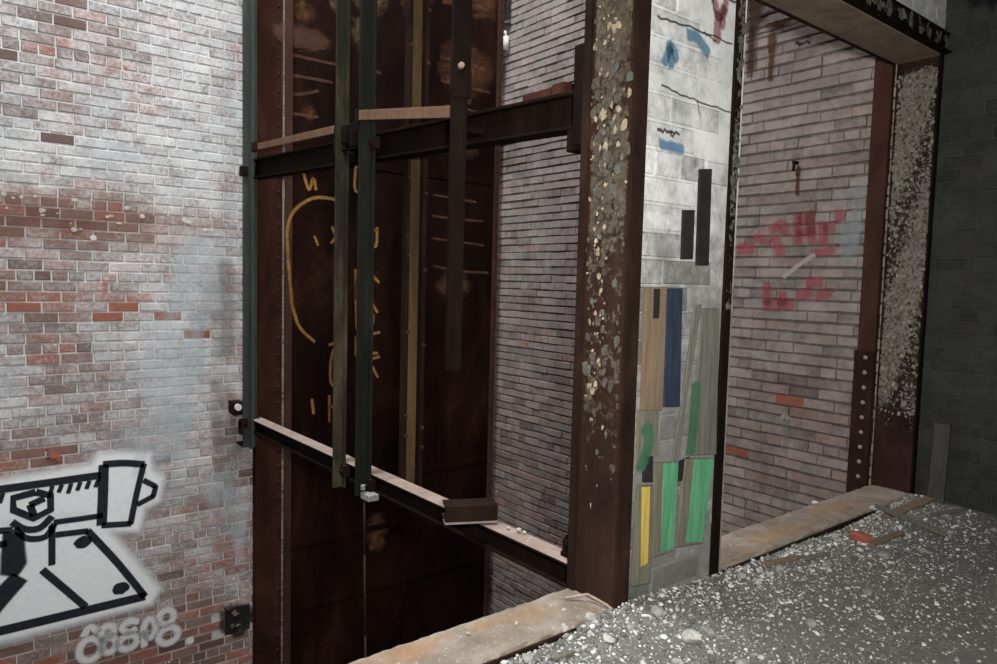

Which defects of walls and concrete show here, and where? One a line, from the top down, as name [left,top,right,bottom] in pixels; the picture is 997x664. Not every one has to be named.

crack [658,0,811,46]